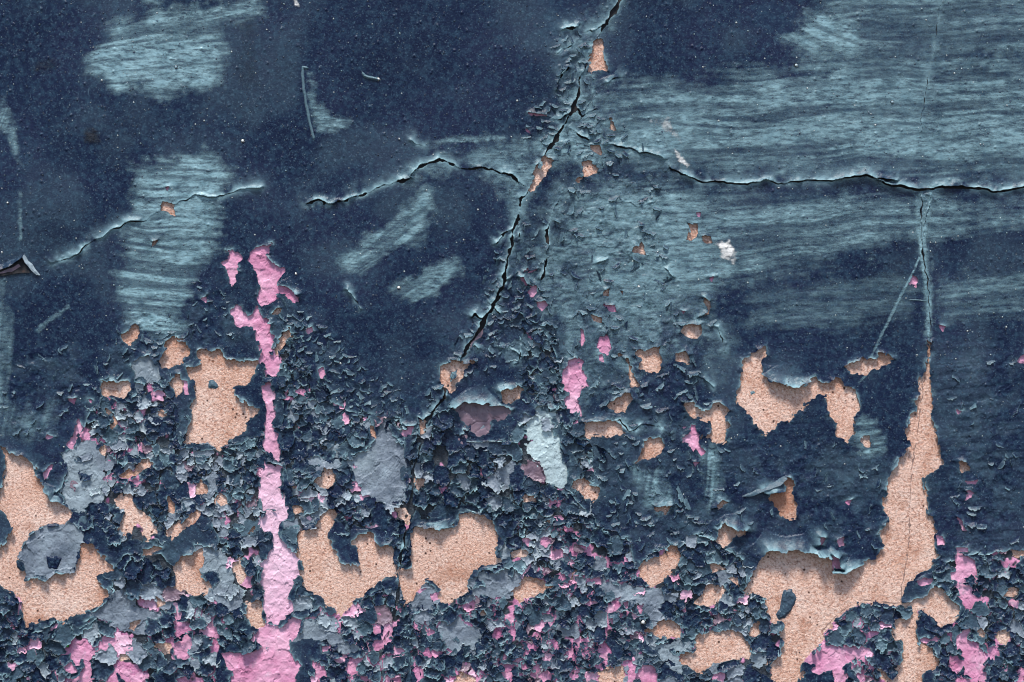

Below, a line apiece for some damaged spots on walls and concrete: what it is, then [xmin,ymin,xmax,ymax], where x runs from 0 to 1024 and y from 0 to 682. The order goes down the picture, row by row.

crack [47,184,266,268]
crack [394,513,412,604]
crack [301,137,564,419]
peeling [0,215,1024,682]
peeling [522,31,629,217]
crack [540,0,1024,630]